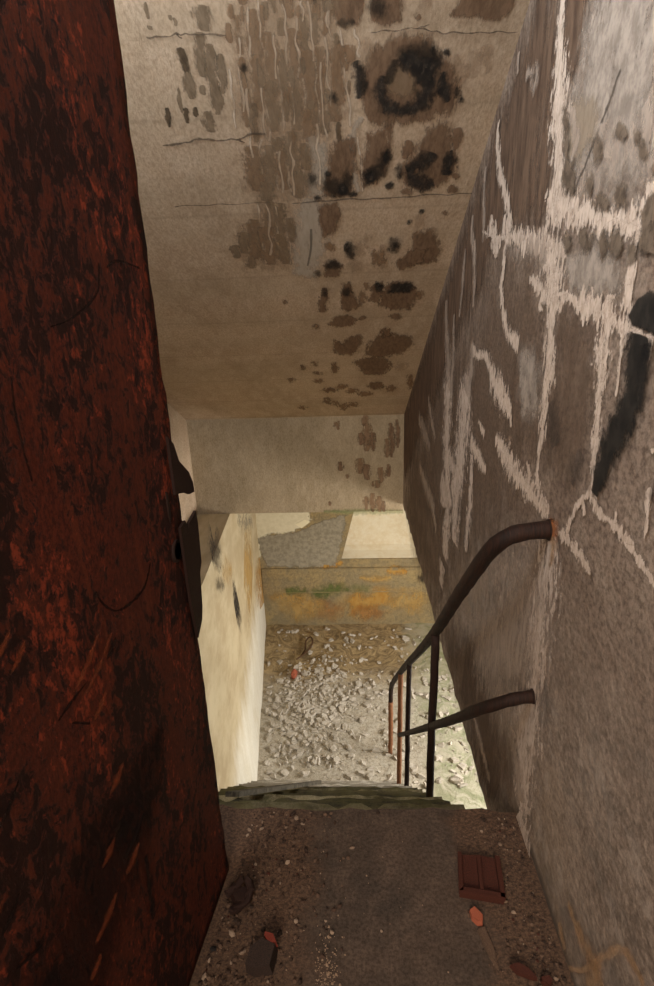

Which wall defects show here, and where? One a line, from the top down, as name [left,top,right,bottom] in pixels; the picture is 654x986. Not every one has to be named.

crack [147,31,225,39]
crack [371,25,516,34]
crack [163,133,265,146]
water stain [165,0,654,856]
spalling [209,527,231,571]
peeling [237,512,346,569]
corrosion [244,534,424,621]
spalling [217,582,241,628]